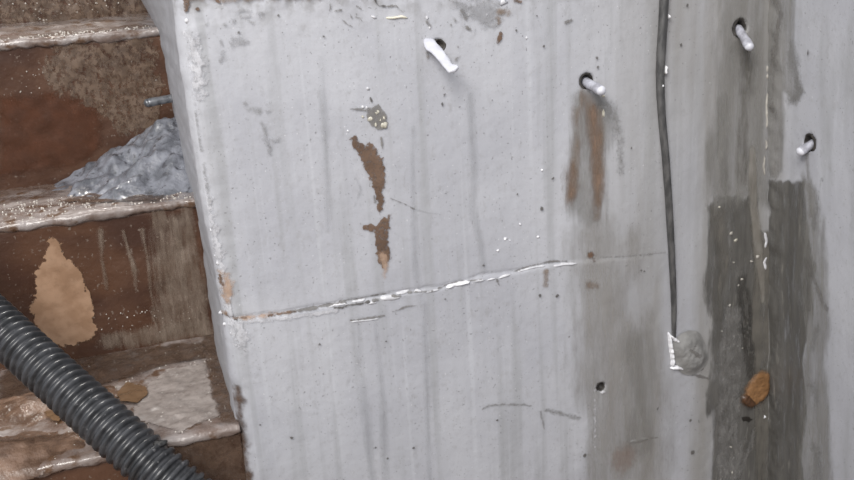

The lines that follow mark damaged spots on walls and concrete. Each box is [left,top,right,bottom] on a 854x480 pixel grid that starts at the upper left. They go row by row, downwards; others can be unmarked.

rust [568,94,619,218]
crack [237,260,578,324]
water stain [705,0,829,480]